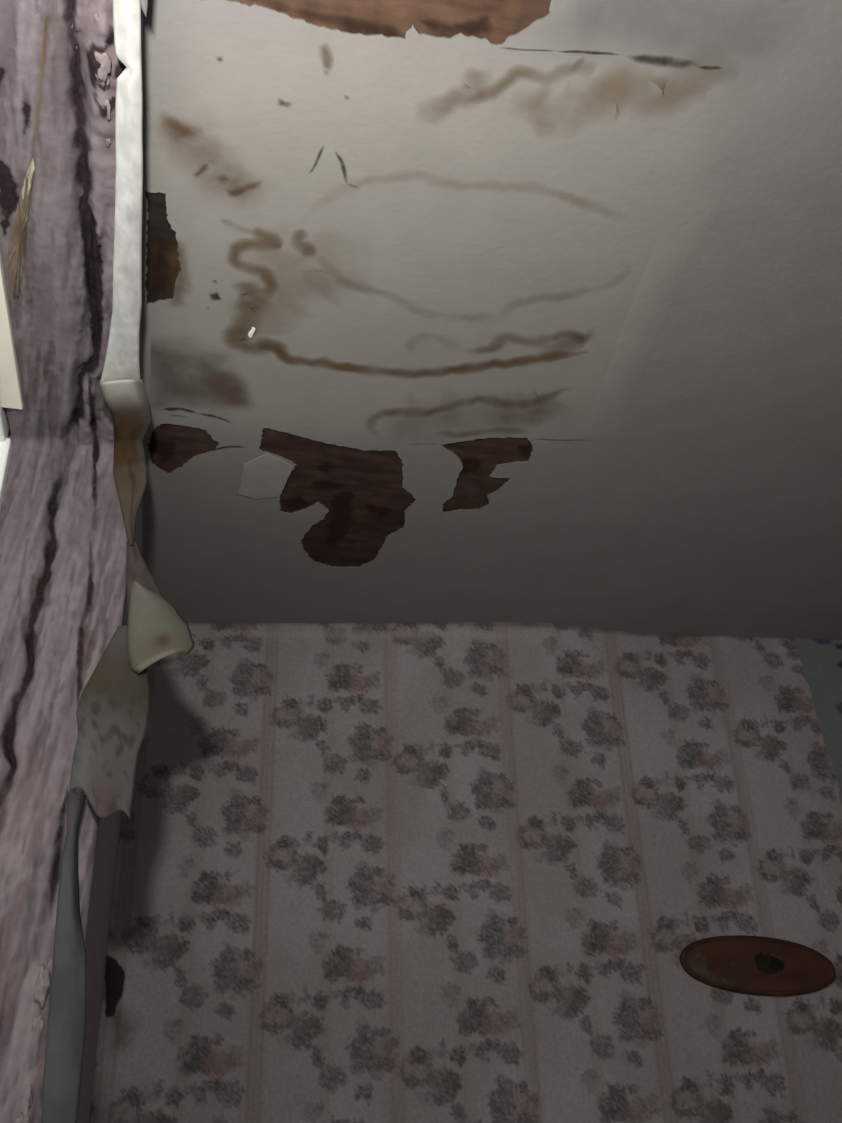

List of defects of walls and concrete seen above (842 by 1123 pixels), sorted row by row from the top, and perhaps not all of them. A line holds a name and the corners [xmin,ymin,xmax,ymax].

peeling [231,0,551,44]
peeling [145,192,181,303]
damp [229,324,365,371]
damp [389,348,561,376]
peeling [148,424,219,473]
peeling [239,428,416,567]
peeling [443,437,532,512]